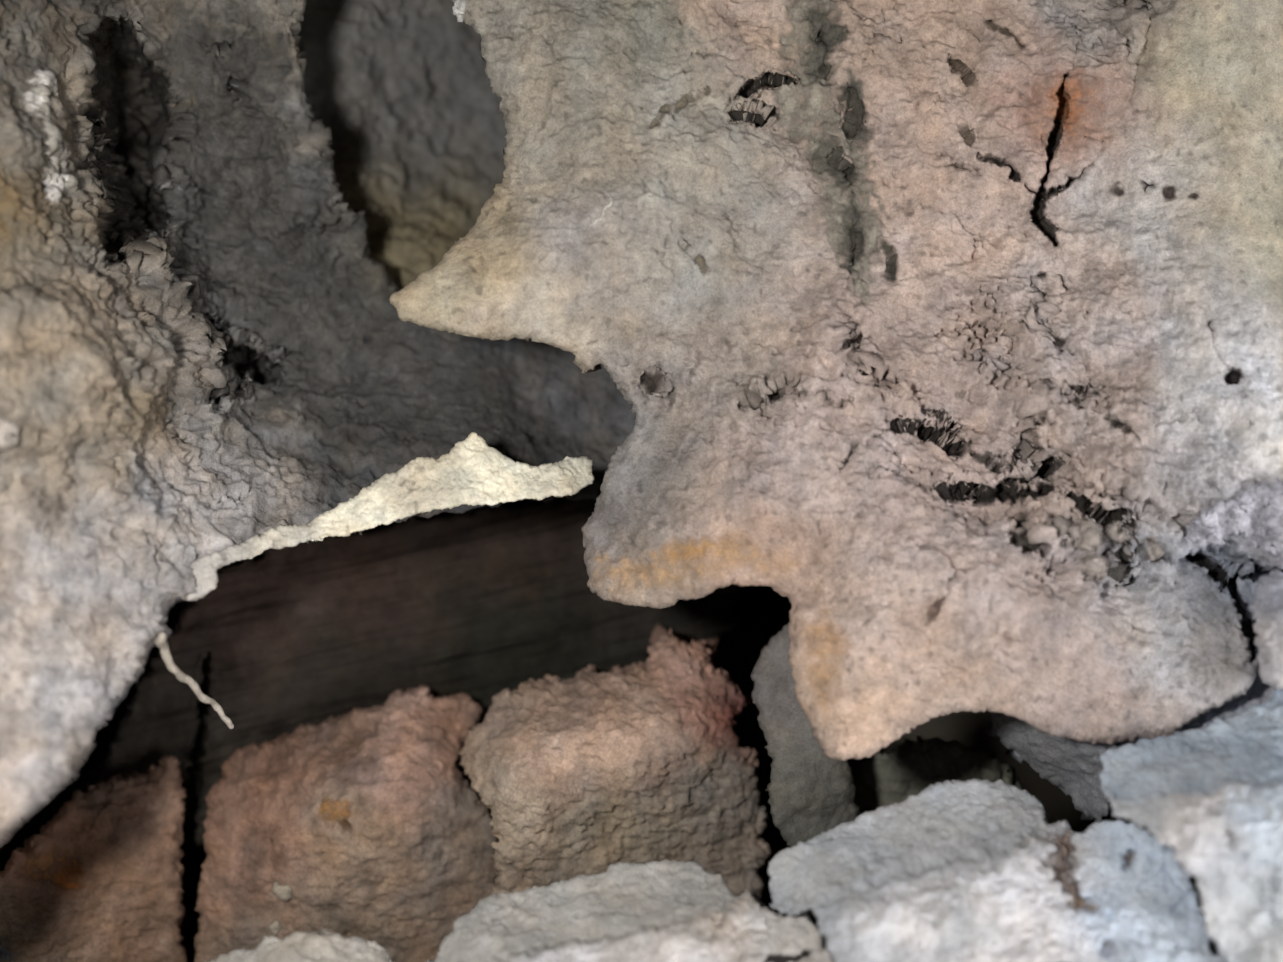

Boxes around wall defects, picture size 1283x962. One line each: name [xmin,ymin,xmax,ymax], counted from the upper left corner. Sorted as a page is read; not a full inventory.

peeling [452,0,465,23]
crack [986,20,1023,47]
crack [948,59,975,84]
crack [649,33,865,185]
corrosion [1026,71,1103,144]
crack [955,75,1075,246]
crack [686,245,708,274]
crack [848,226,897,282]
crack [1066,383,1137,435]
crack [840,408,1137,557]
peeling [272,882,292,901]